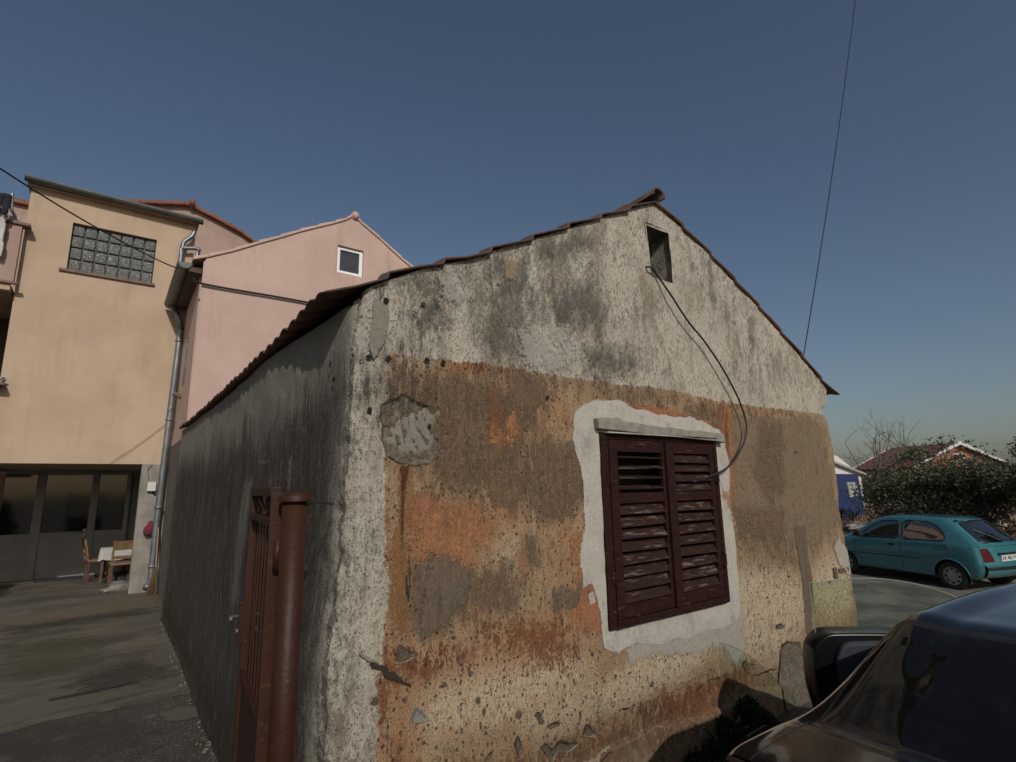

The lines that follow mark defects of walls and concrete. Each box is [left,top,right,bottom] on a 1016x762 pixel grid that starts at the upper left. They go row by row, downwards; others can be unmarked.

leakage [474,224,643,438]
spalling [380,393,441,466]
leakage [74,266,454,762]
spalling [360,643,431,725]
spalling [535,712,561,729]
spalling [541,710,604,762]
crack [583,746,612,762]
spalling [743,641,811,711]